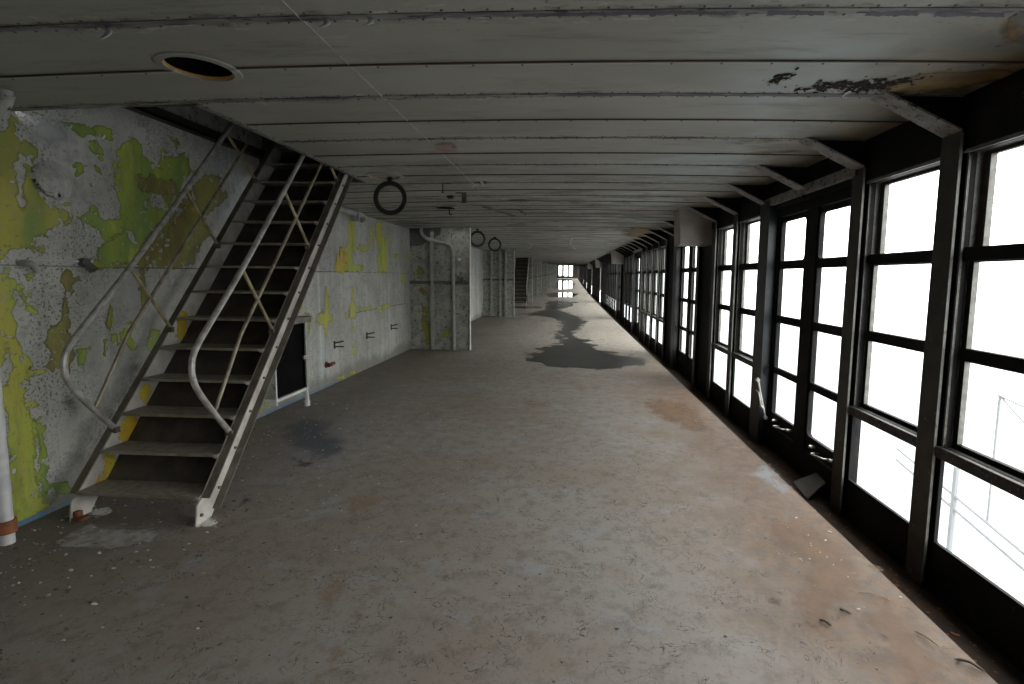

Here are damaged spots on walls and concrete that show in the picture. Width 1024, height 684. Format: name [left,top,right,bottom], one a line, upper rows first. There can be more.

peeling [763,67,933,97]
peeling [0,114,228,522]
peeling [301,286,391,380]
peeling [333,216,450,345]
leakage [523,301,652,370]